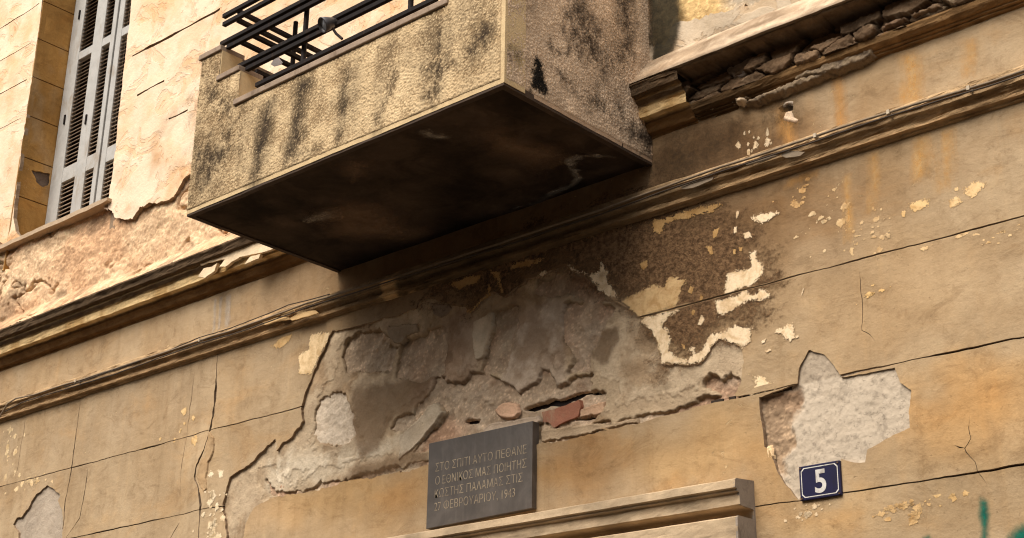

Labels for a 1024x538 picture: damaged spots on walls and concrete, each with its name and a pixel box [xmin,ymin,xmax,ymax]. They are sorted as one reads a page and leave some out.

water stain [468,22,493,55]
water stain [530,56,548,95]
water stain [563,0,605,74]
flaking render [0,178,275,329]
water stain [196,131,231,191]
water stain [251,100,275,184]
water stain [286,80,310,159]
peeling [735,128,806,165]
peeling [790,177,930,256]
peeling [949,181,986,208]
flaking render [201,201,911,538]
flaking render [1,426,63,538]